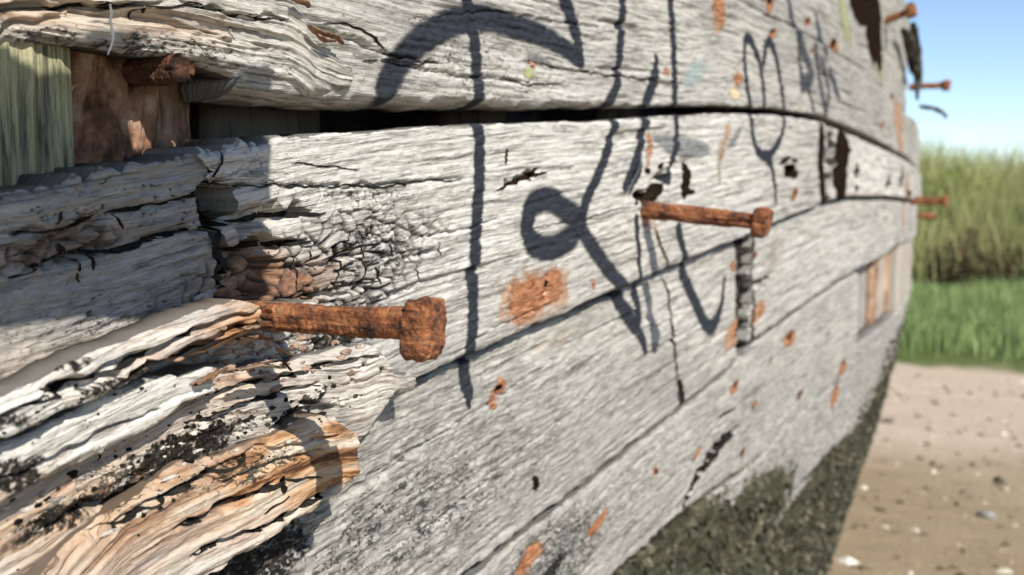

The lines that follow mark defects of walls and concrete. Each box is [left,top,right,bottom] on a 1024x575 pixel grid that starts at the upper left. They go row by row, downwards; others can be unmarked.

crack [7,149,462,300]
corrosion [501,268,568,326]
corrosion [486,377,506,409]
crack [683,407,739,509]